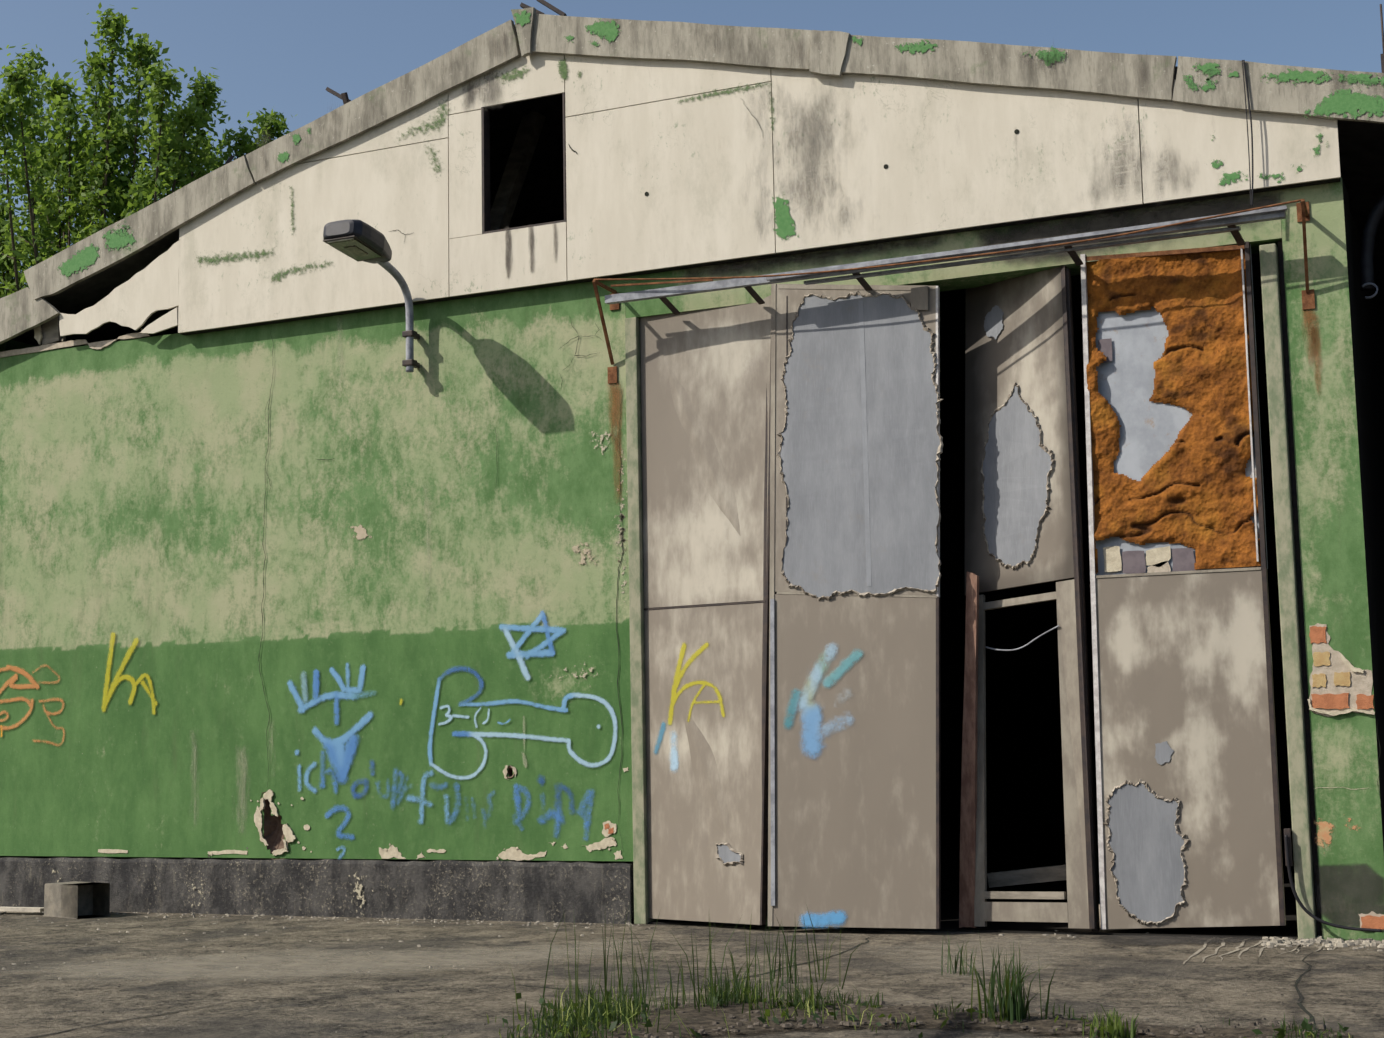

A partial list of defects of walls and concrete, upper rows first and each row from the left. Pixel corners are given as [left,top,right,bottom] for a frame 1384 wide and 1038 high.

peeling [780,294,940,597]
peeling [983,385,1052,566]
crack [258,336,274,786]
spalling [1308,623,1375,717]
spalling [208,789,312,860]
peeling [379,843,446,859]
peeling [496,821,623,861]
peeling [1107,783,1185,922]
crack [1294,952,1316,1027]